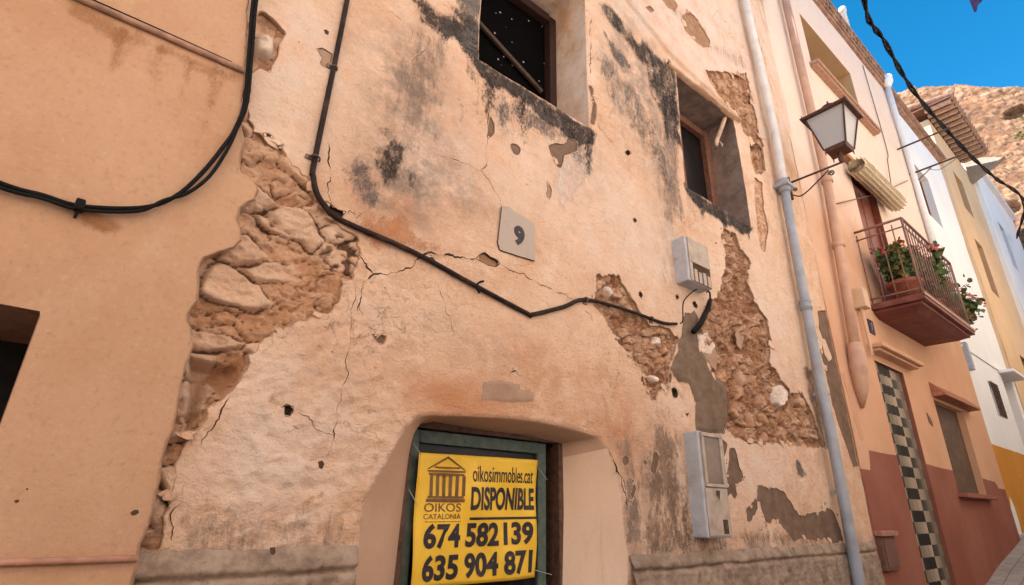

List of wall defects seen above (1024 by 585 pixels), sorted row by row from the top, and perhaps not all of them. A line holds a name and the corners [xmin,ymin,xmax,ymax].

water stain [349,129,415,207]
water stain [402,0,595,205]
peeling [549,138,578,168]
water stain [599,5,683,217]
spalling [705,69,768,252]
crack [168,482,186,541]
crack [201,398,229,444]
spalling [139,89,362,553]
crack [293,250,477,457]
spalling [592,273,679,403]
spalling [697,227,824,498]
peeling [746,485,843,546]